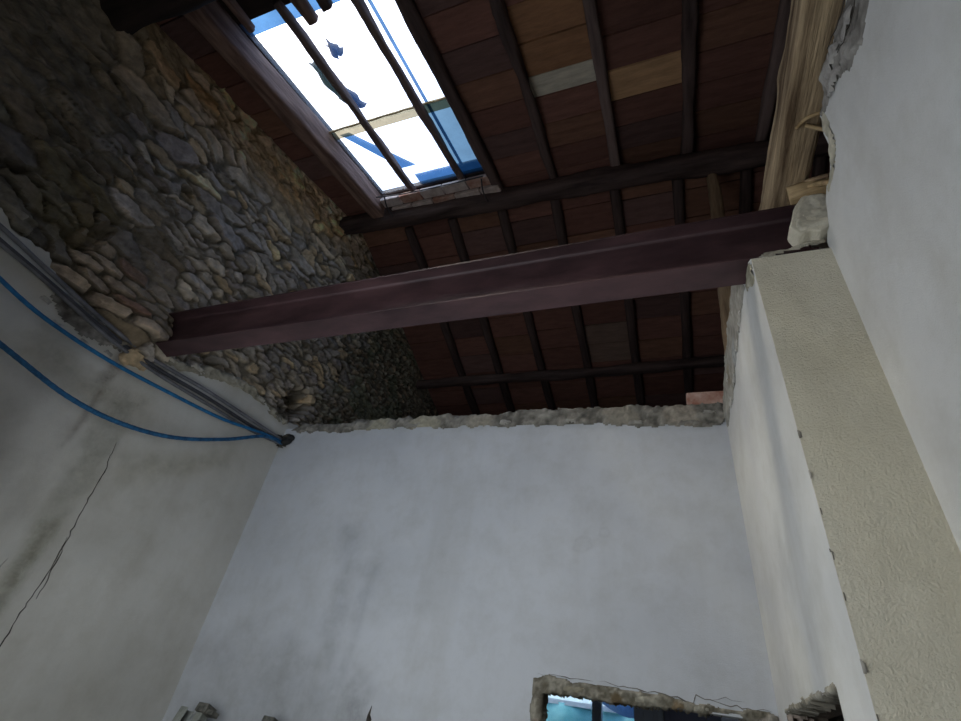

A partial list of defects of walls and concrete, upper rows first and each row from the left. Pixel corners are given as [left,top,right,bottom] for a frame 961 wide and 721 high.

flaking render [819,0,869,192]
crack [0,444,116,647]